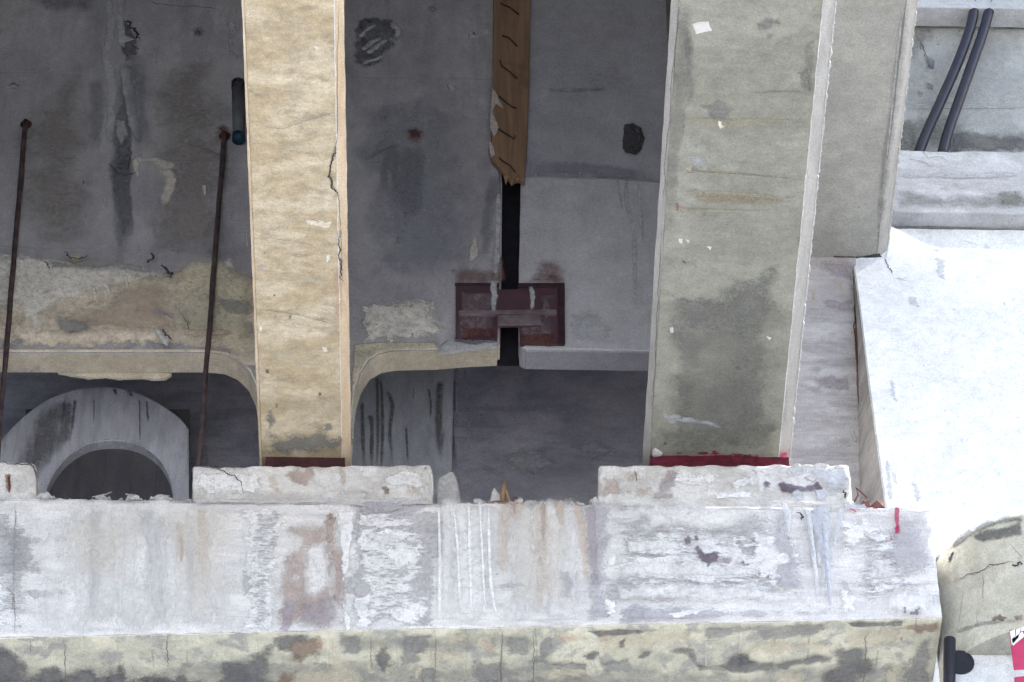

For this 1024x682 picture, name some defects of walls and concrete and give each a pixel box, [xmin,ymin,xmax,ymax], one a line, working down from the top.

crack [265,16,342,280]
spalling [622,123,650,155]
flaking render [0,252,154,327]
flaking render [176,258,262,354]
flaking render [362,300,499,355]
corrosion [490,281,498,310]
corrosion [529,264,557,309]
corrosion [279,513,344,630]
leakage [317,502,356,589]
leakage [438,461,938,682]
leakage [0,651,186,682]
leakage [220,635,348,682]